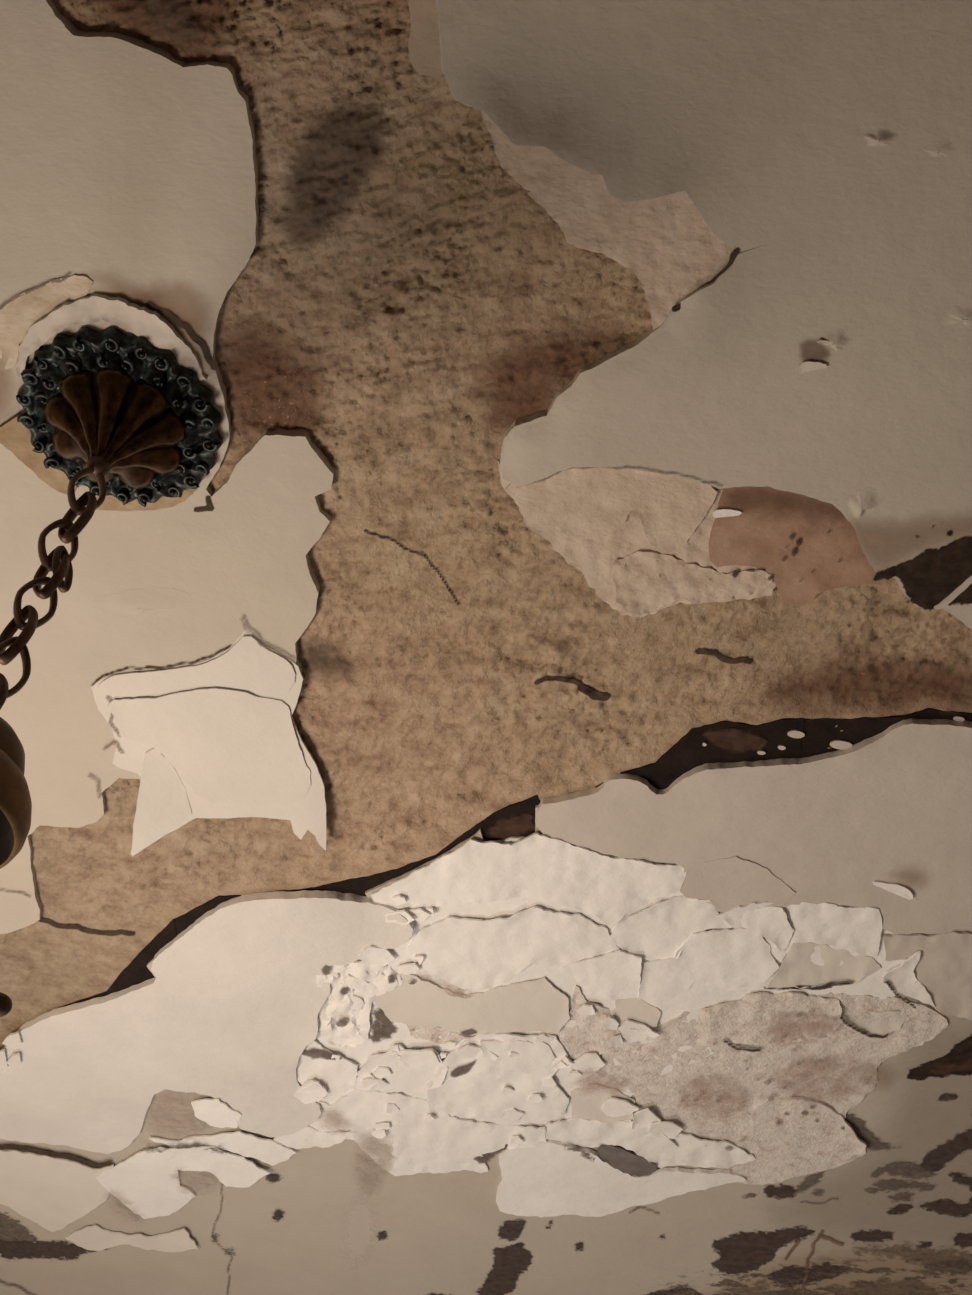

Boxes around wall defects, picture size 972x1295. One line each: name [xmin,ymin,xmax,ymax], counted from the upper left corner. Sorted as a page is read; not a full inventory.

flaking render [0,273,217,381]
flaking render [480,110,789,487]
flaking render [498,459,776,618]
peeling [873,537,972,611]
flaking render [91,617,327,857]
flaking render [536,718,972,934]
peeling [0,833,972,1232]
leakage [907,1034,972,1101]
leakage [0,1213,96,1261]
crack [0,1145,112,1168]
leakage [476,1220,533,1295]
leakage [650,1129,972,1295]